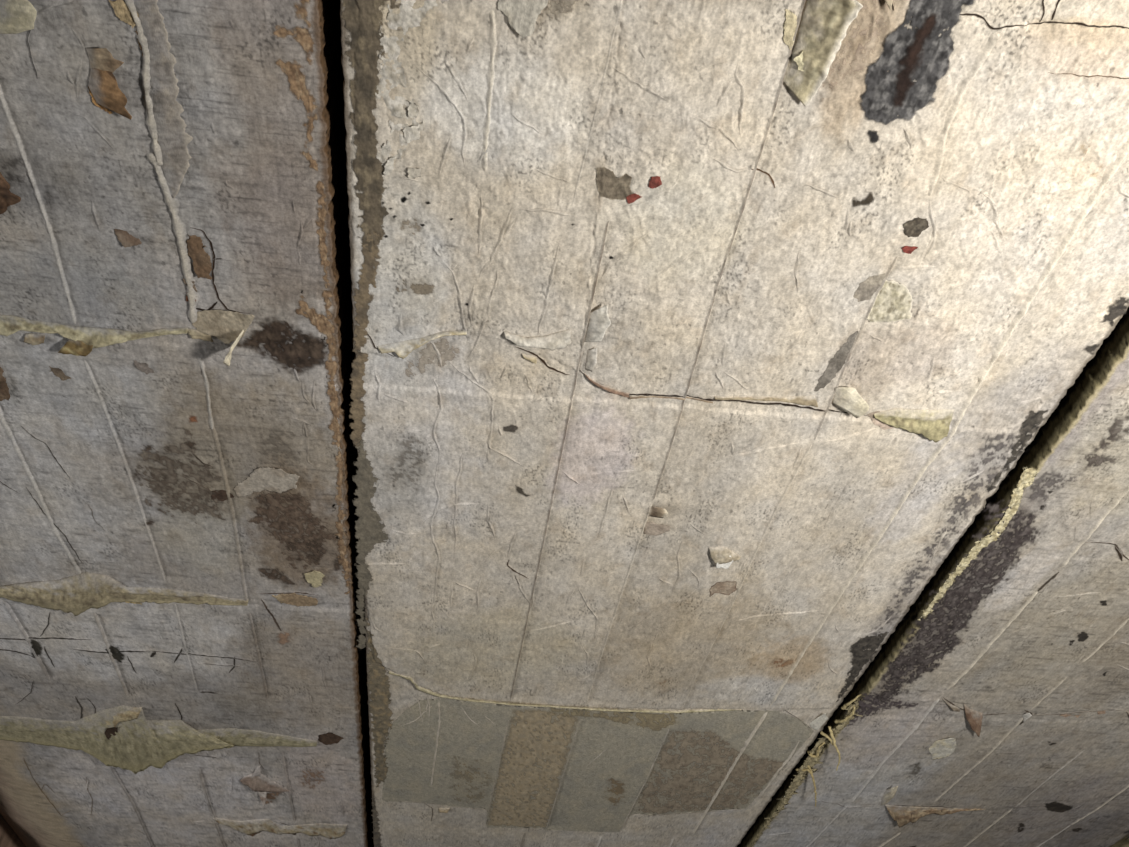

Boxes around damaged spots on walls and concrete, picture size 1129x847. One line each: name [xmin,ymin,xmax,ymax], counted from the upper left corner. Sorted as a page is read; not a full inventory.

peeling [86,48,132,120]
peeling [108,0,193,198]
peeling [783,0,894,106]
mould [860,0,975,143]
crack [960,0,1129,30]
spalling [902,217,929,254]
crack [581,304,869,418]
spalling [814,331,858,392]
spalling [274,0,828,847]
leakage [1085,416,1129,468]
leakage [848,434,1075,726]
spalling [836,632,889,702]